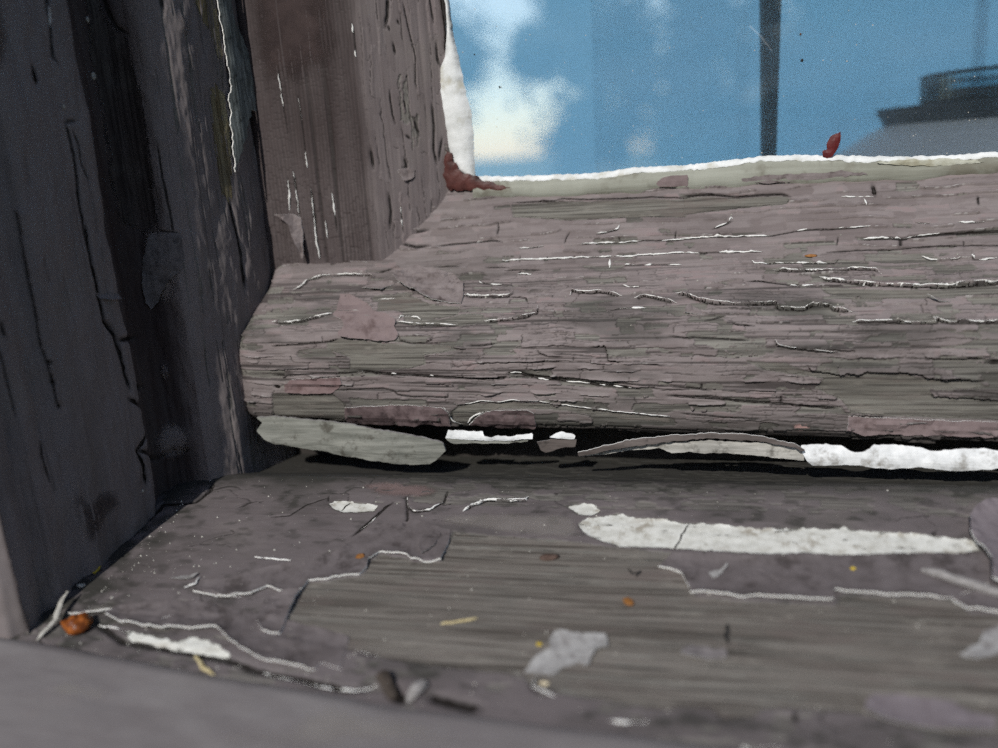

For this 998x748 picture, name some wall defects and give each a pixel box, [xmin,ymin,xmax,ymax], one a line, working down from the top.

peeling [87,0,185,309]
peeling [210,0,257,204]
crack [385,0,447,167]
peeling [656,175,688,187]
crack [64,120,140,405]
peeling [274,214,304,260]
peeling [271,265,539,370]
peeling [635,292,998,324]
peeling [775,266,998,302]
crack [135,437,154,483]
peeling [273,363,998,471]
peeling [67,497,998,735]